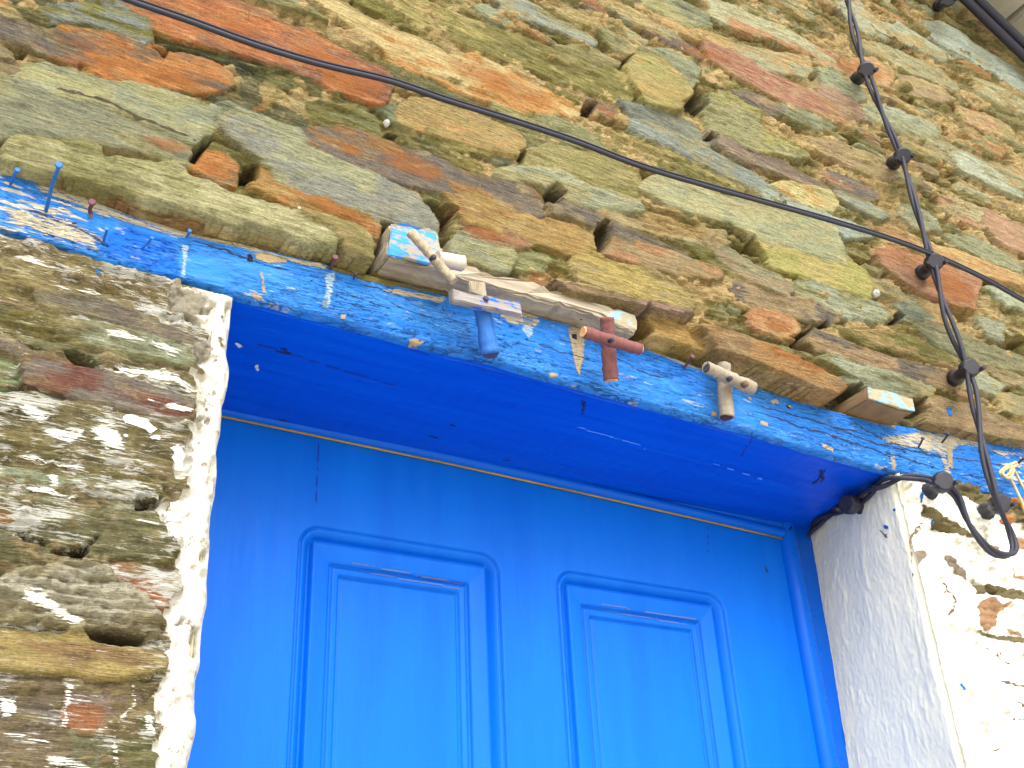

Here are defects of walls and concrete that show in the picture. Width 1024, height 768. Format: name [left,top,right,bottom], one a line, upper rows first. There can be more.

peeling [4,207,105,252]
peeling [36,184,187,238]
peeling [238,246,326,269]
peeling [383,289,446,303]
spalling [104,329,224,364]
peeling [113,365,193,392]
peeling [19,401,161,452]
peeling [166,403,208,430]
peeling [20,455,86,499]
peeling [883,431,990,504]
peeling [921,504,973,537]
peeling [944,555,1024,643]